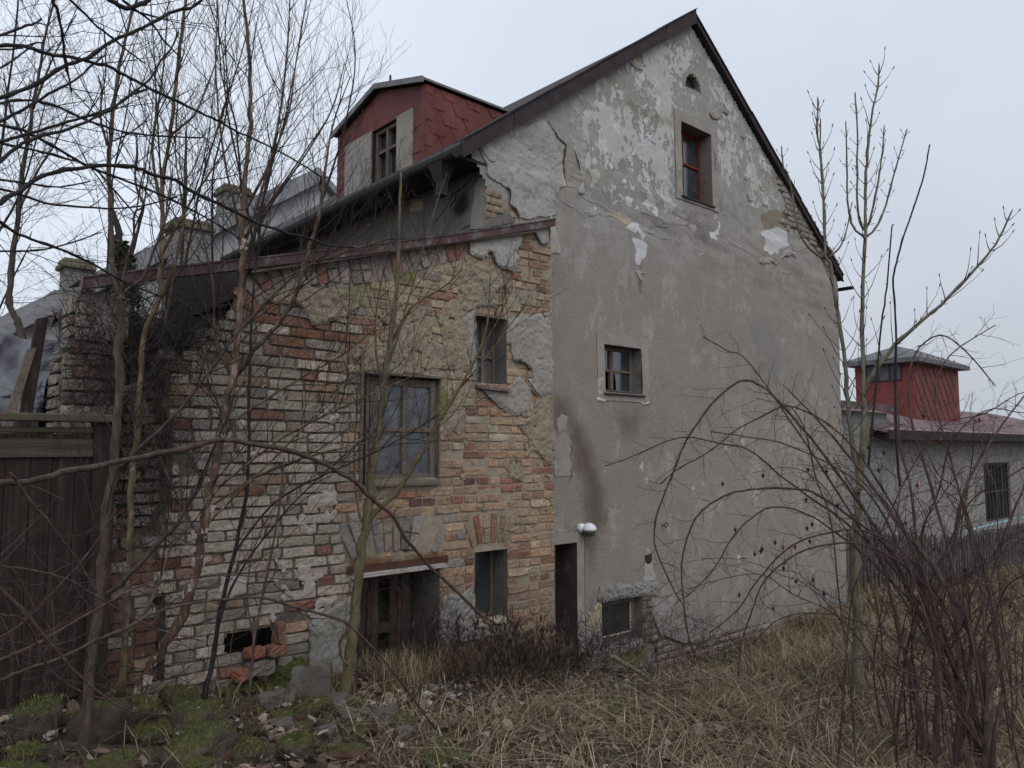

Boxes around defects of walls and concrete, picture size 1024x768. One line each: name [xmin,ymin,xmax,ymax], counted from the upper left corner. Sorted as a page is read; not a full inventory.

crack [547,120,585,185]
peeling [469,33,840,280]
flaking render [462,308,554,428]
peeling [440,386,467,441]
peeling [297,490,338,535]
peeling [214,562,247,599]
peeling [307,595,338,615]